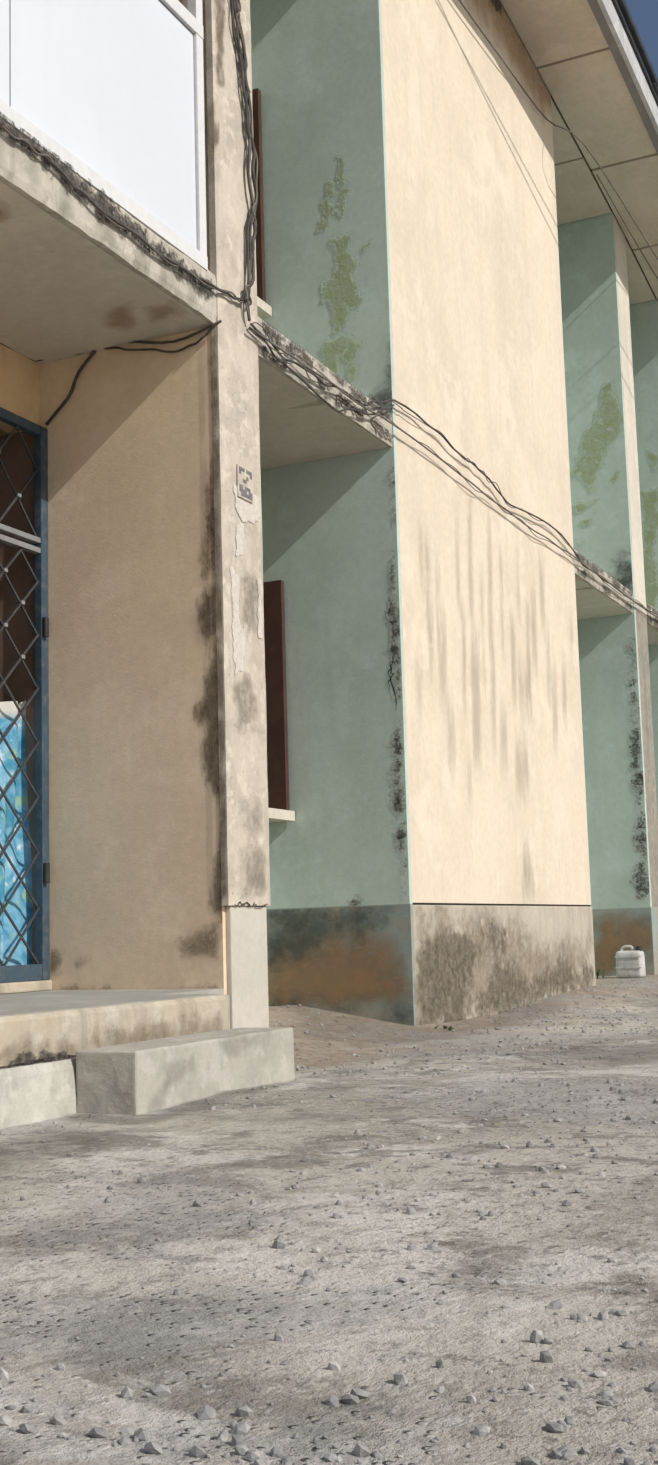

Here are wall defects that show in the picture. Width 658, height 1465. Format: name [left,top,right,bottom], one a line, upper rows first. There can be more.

leakage [0,112,218,297]
leakage [210,341,218,420]
peeling [260,154,393,441]
peeling [572,382,624,546]
peeling [587,447,658,628]
leakage [184,442,226,956]
peeling [386,550,402,700]
peeling [387,721,408,895]
leakage [267,909,367,964]
leakage [396,933,593,1025]